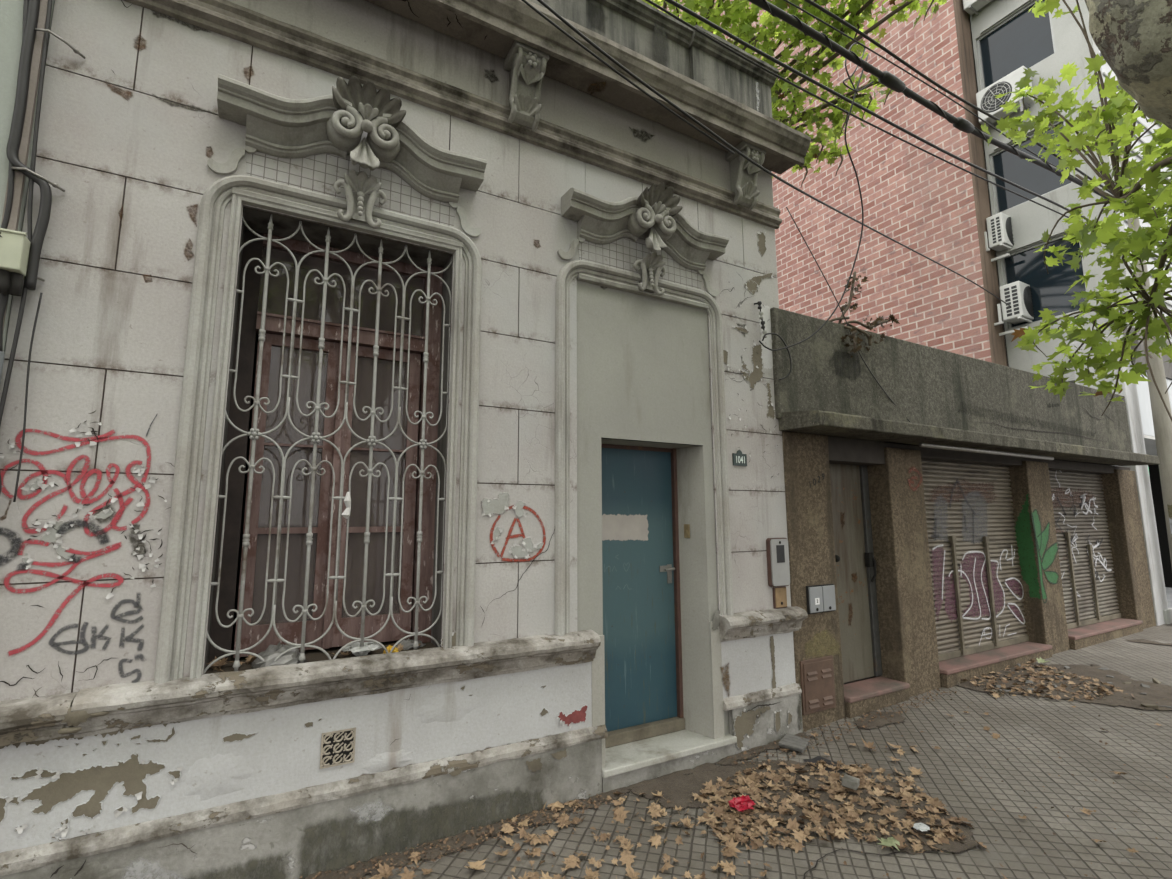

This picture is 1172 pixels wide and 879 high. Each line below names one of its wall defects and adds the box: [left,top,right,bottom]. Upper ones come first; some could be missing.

peeling [709,272,778,462]
peeling [69,410,102,447]
peeling [20,475,59,492]
peeling [22,494,118,569]
peeling [121,464,171,588]
peeling [222,732,257,743]
peeling [539,705,588,728]
spalling [733,703,792,751]
peeling [0,707,183,842]
leakage [300,790,544,879]
leakage [125,854,287,879]